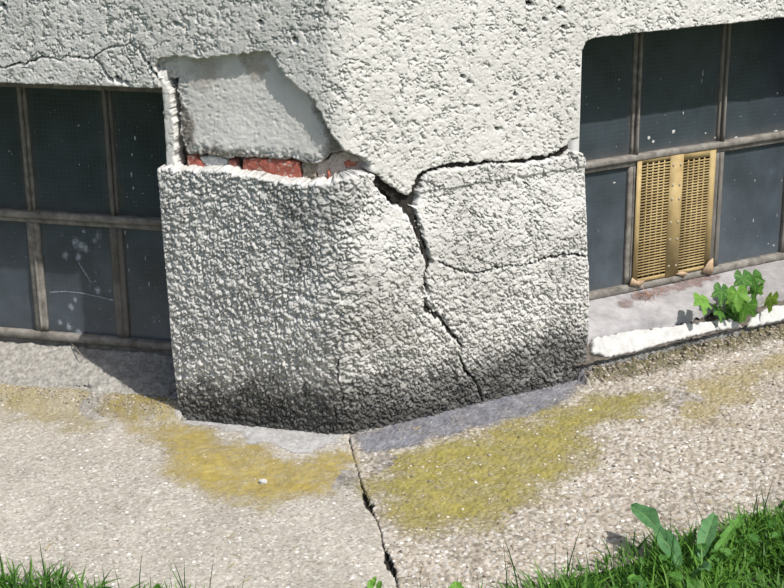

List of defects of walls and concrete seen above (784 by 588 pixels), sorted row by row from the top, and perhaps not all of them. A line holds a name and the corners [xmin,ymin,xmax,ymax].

crack [1,42,158,79]
flaking render [159,51,370,180]
crack [370,141,586,400]
damp [176,322,784,453]
crack [349,440,397,587]